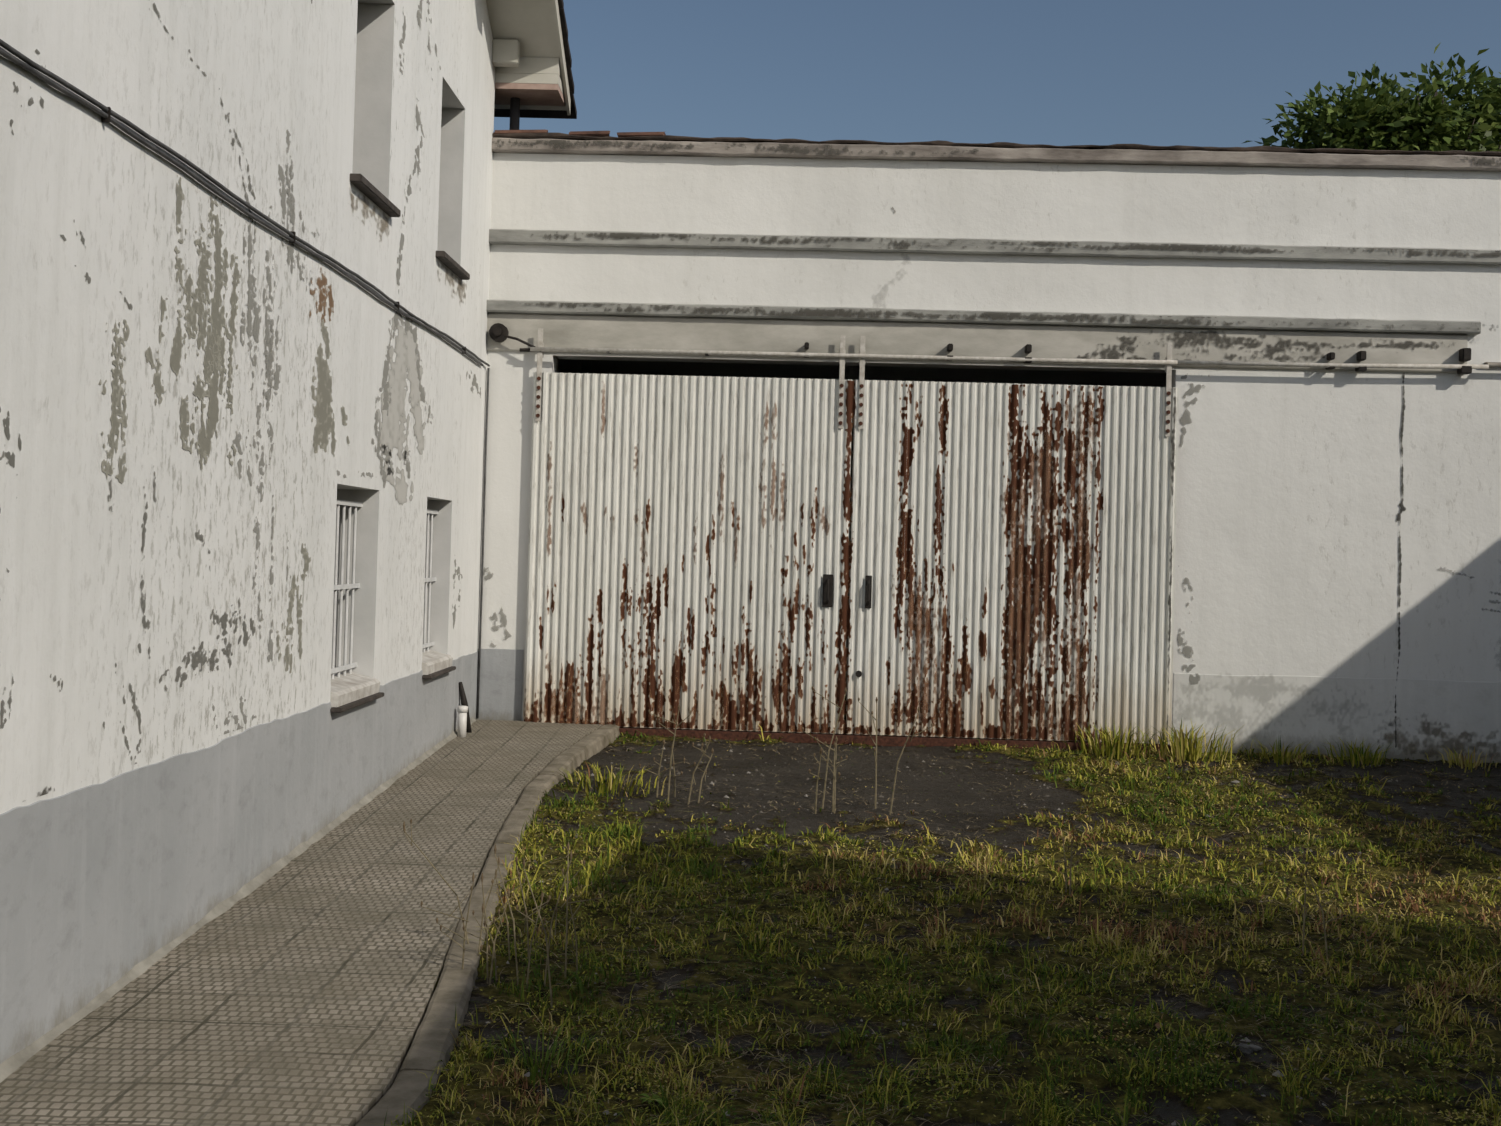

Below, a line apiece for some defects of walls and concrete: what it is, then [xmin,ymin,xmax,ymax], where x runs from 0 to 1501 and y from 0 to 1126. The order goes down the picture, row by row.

peeling [99,291,133,483]
peeling [145,130,432,691]
corrosion [524,380,1113,742]
crack [1395,373,1406,748]
crack [1438,567,1500,612]